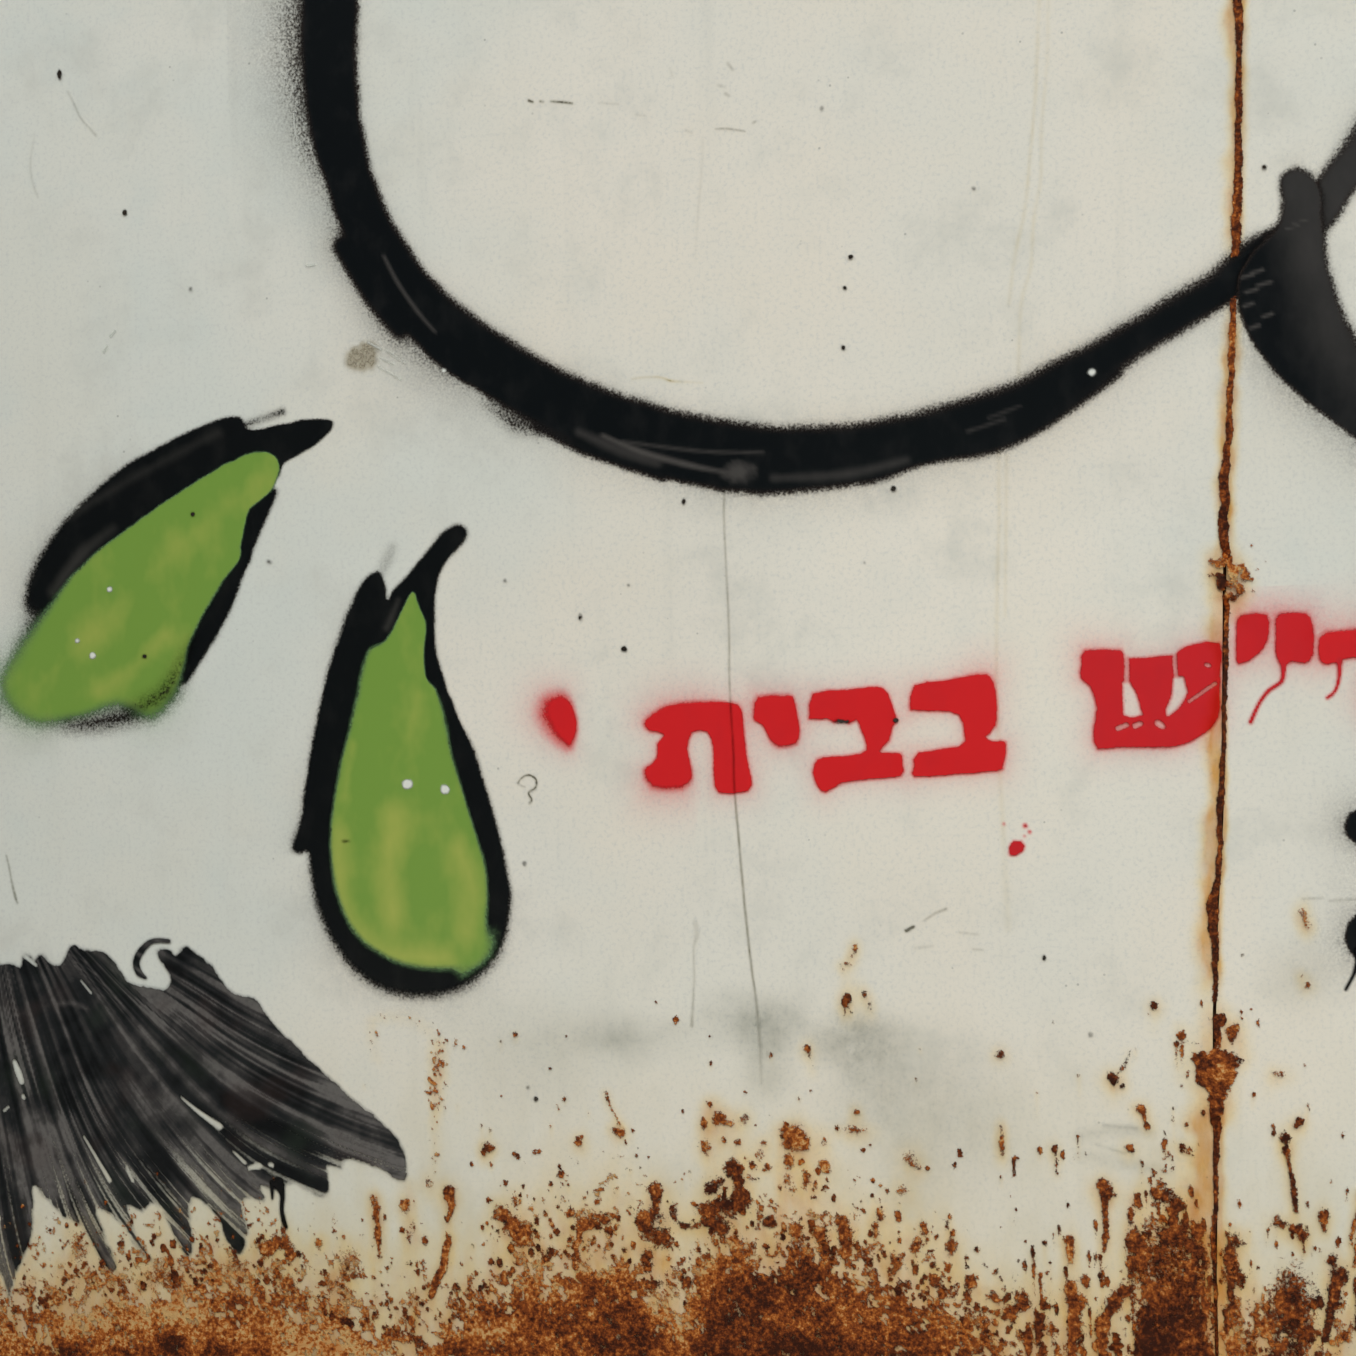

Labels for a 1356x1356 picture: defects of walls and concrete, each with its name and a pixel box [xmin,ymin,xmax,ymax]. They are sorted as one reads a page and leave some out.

corrosion [1230,0,1244,257]
corrosion [0,296,1356,1356]